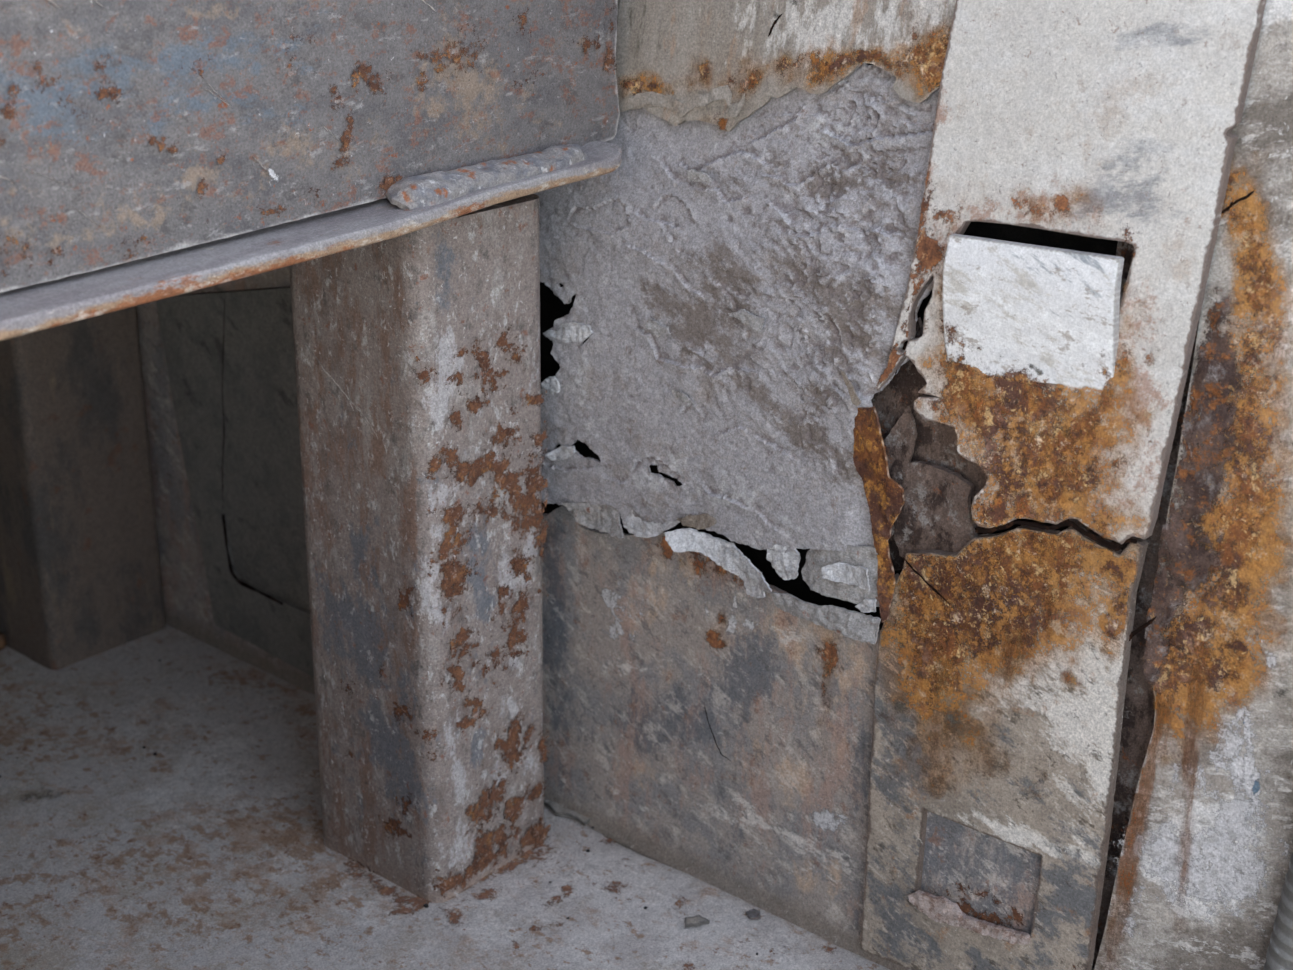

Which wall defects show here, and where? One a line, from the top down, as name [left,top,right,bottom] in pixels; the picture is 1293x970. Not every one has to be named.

rust [0,54,125,146]
rust [330,60,392,178]
rust [416,17,487,92]
rust [567,2,674,95]
rust [728,21,950,96]
peeling [534,63,939,644]
rust [413,325,549,732]
rust [878,163,1154,799]
crack [975,520,1137,551]
rust [1109,171,1293,932]
crack [1129,617,1156,641]
rust [344,712,568,927]